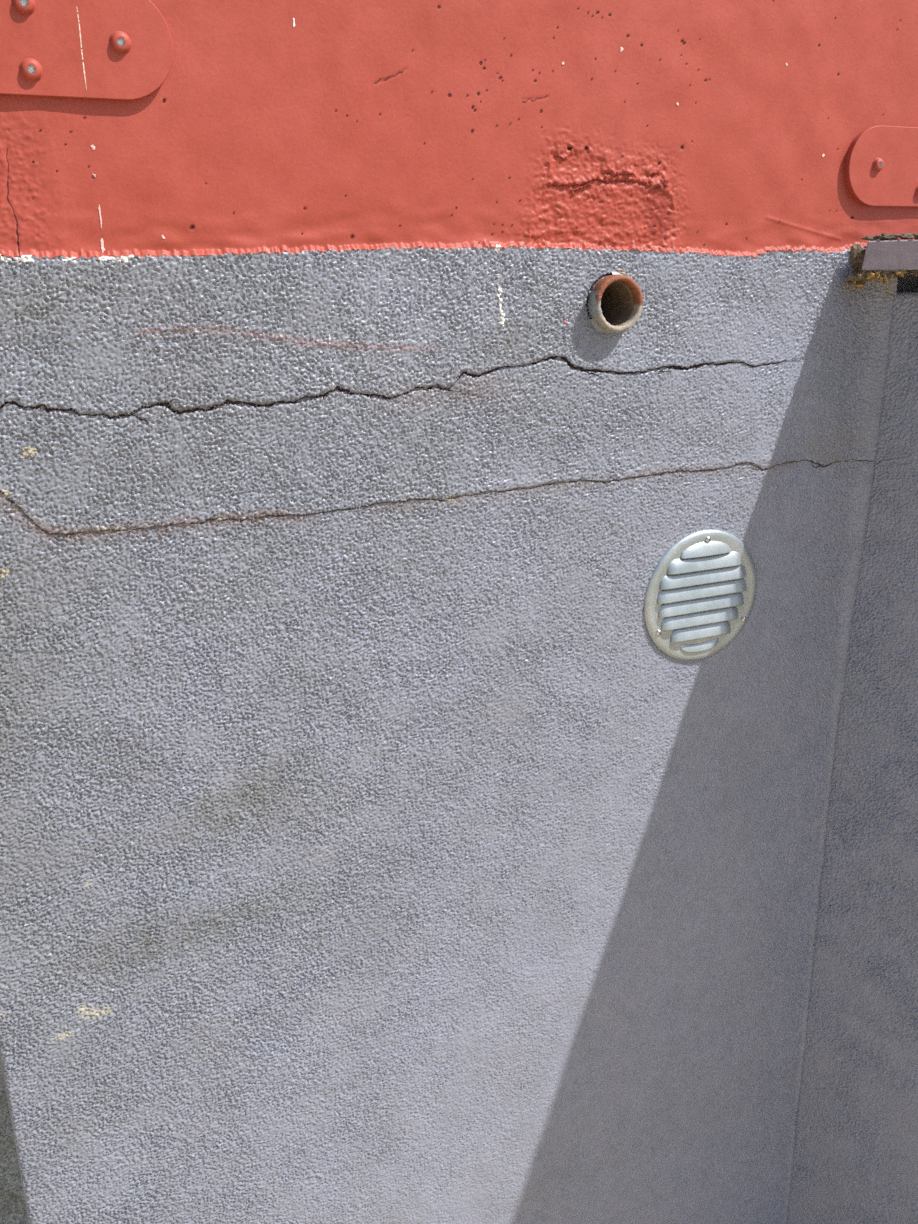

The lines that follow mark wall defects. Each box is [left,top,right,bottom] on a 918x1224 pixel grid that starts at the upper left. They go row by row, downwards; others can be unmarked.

crack [0,356,801,425]
crack [0,453,881,552]